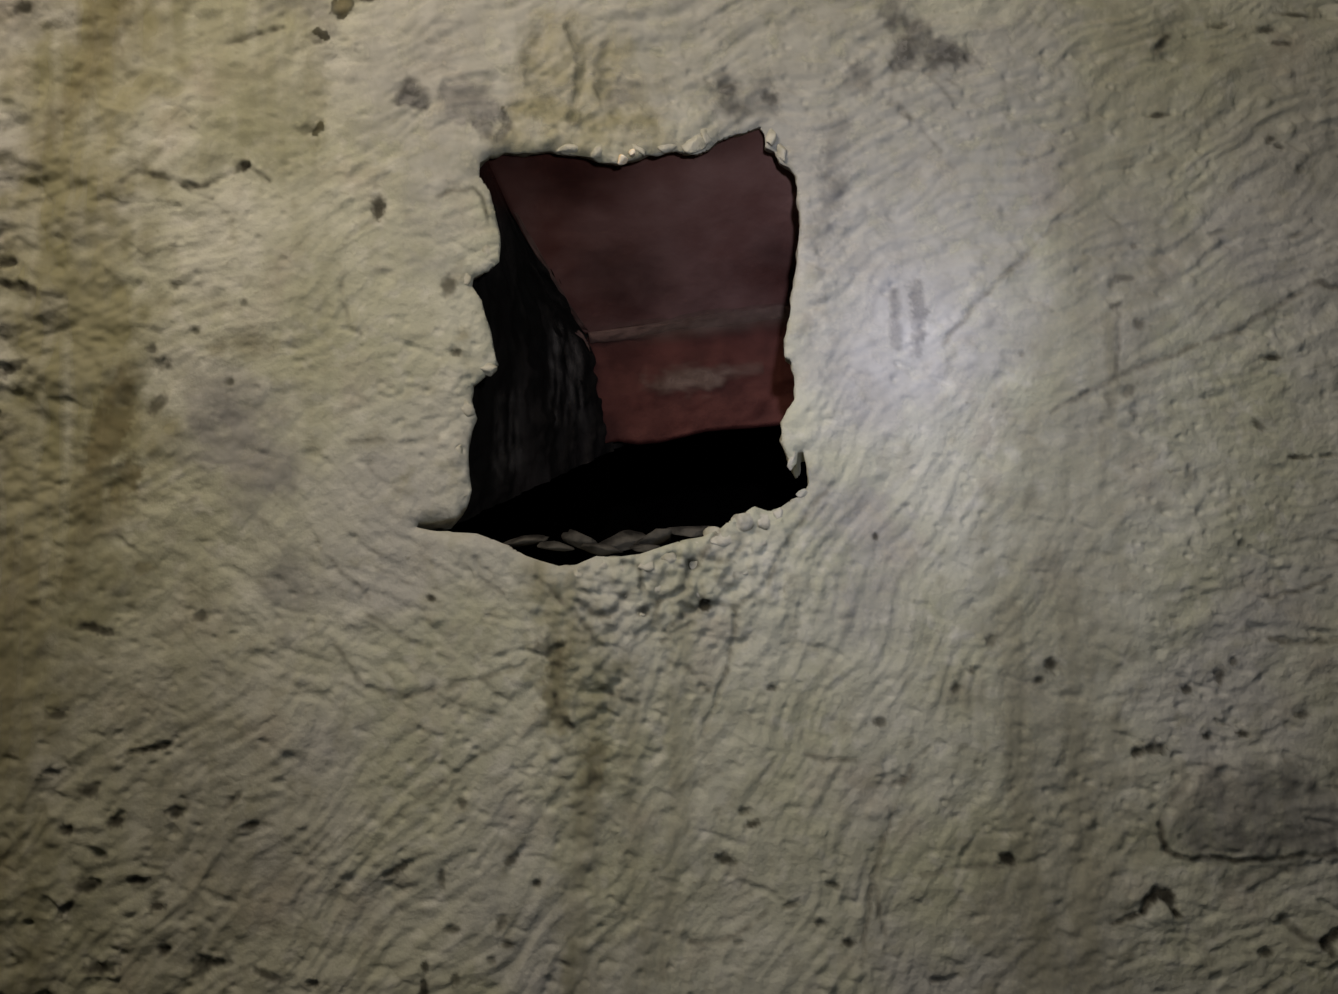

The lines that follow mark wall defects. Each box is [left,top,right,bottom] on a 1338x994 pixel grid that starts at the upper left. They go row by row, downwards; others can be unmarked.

peeling [544,144,602,158]
peeling [618,128,711,165]
peeling [766,129,787,162]
spalling [434,162,808,593]
crack [699,603,710,611]